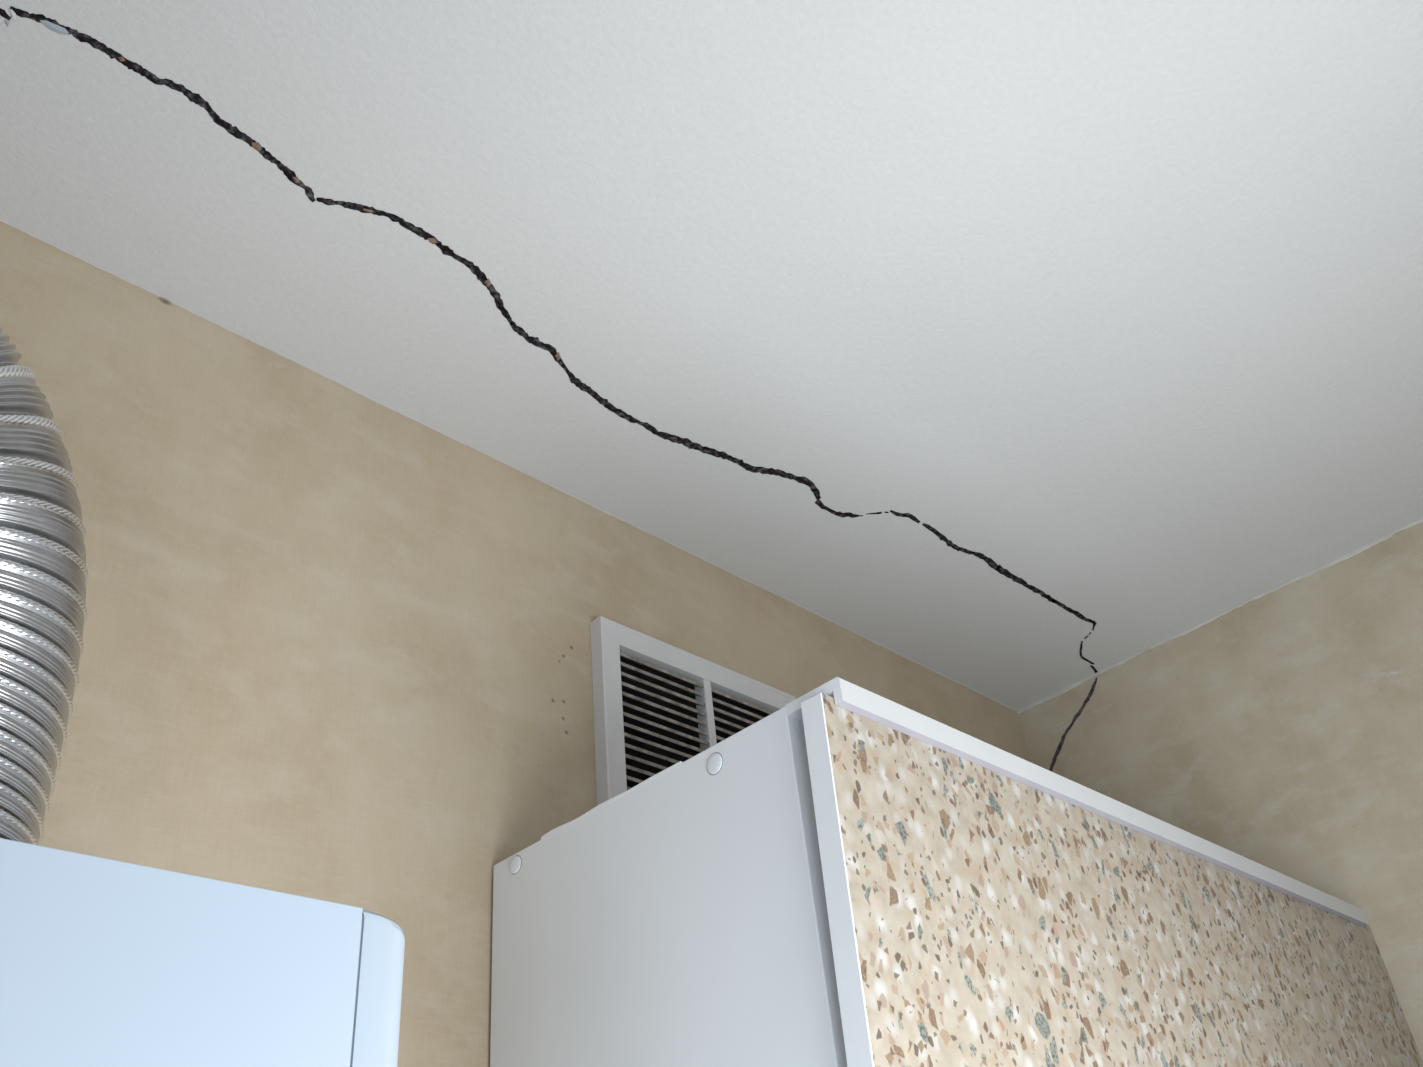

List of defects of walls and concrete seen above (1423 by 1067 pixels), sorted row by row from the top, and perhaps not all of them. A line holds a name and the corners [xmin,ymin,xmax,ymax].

crack [0,6,1098,772]